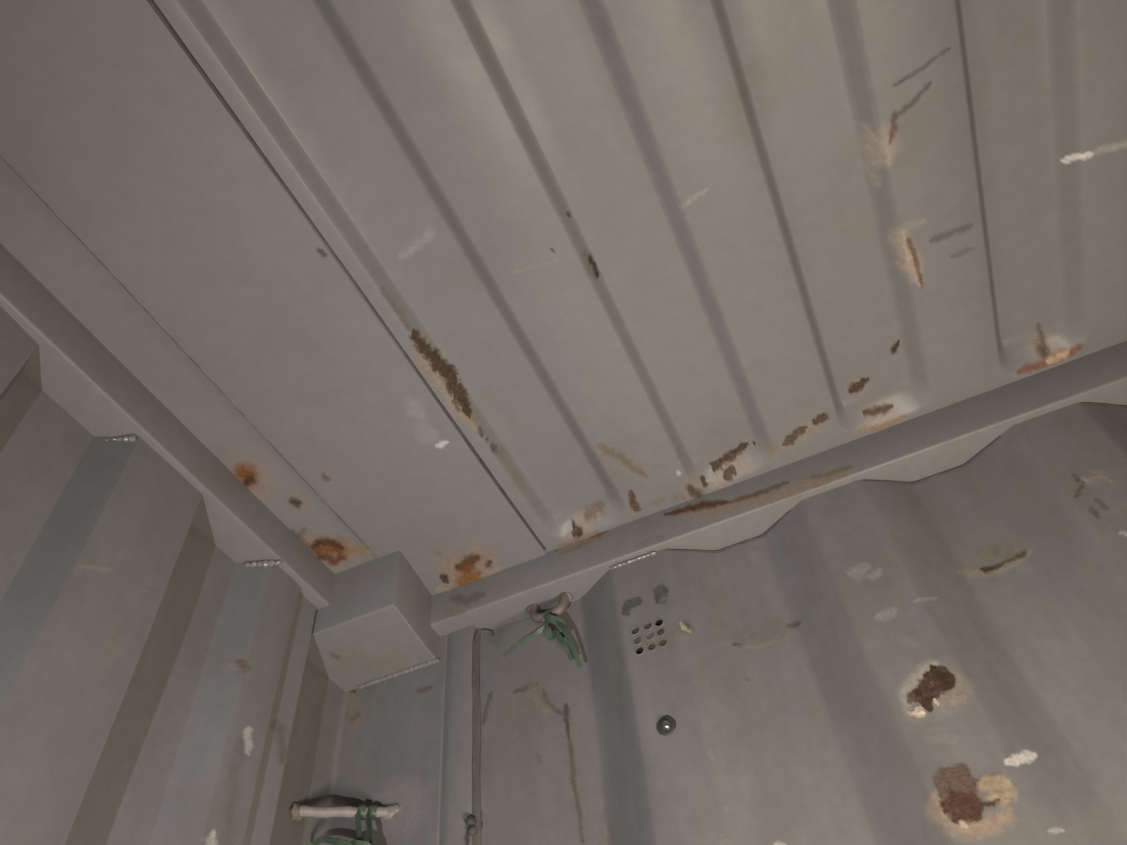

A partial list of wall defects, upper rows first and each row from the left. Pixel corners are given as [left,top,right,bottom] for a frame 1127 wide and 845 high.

corrosion [1018,331,1083,375]
corrosion [236,466,256,486]
corrosion [664,482,789,515]
corrosion [311,539,346,564]
corrosion [440,555,492,587]